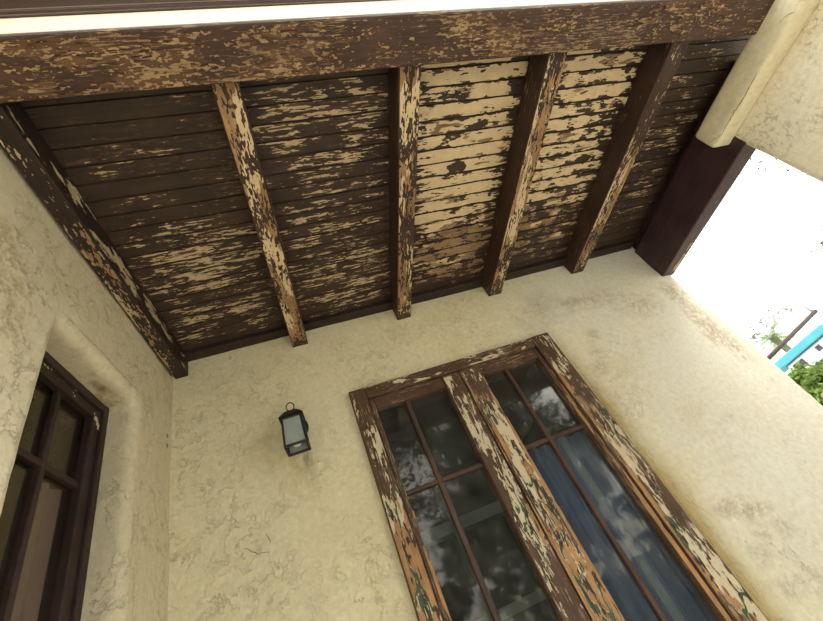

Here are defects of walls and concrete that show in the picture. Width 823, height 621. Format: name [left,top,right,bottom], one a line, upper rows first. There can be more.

peeling [0,0,765,373]
peeling [364,416,452,621]
peeling [388,348,625,621]
peeling [510,335,768,621]